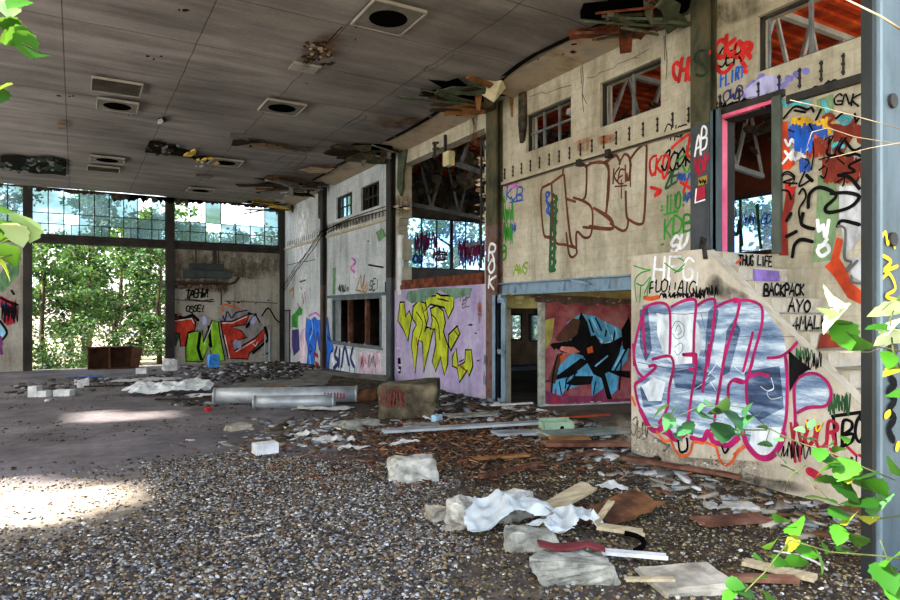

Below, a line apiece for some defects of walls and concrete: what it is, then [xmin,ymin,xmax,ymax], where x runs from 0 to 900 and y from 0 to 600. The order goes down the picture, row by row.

peeling [301,26,343,66]
peeling [482,80,506,102]
peeling [183,149,220,167]